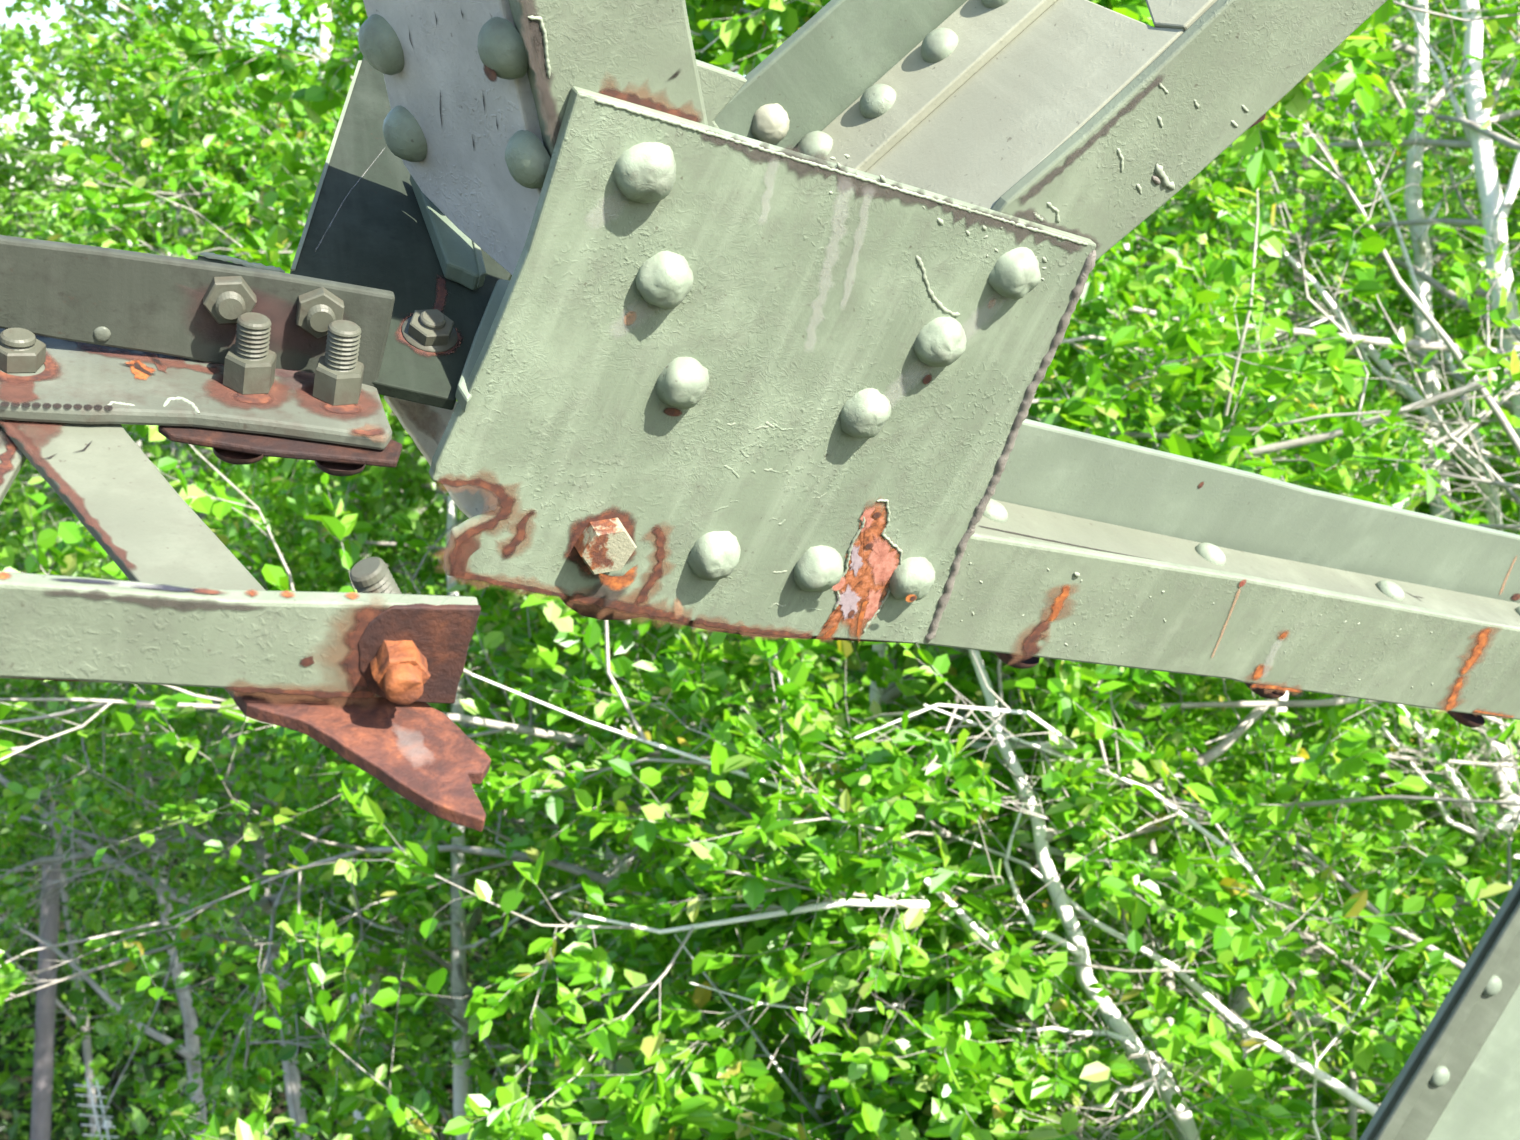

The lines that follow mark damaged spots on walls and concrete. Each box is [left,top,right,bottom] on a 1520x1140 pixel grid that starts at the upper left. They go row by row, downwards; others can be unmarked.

corrosion [0,352,60,402]
corrosion [77,342,383,435]
corrosion [0,419,135,568]
corrosion [229,592,388,699]
corrosion [439,478,811,638]
peeling [821,499,916,639]
corrosion [1023,572,1080,658]
corrosion [1446,628,1491,710]